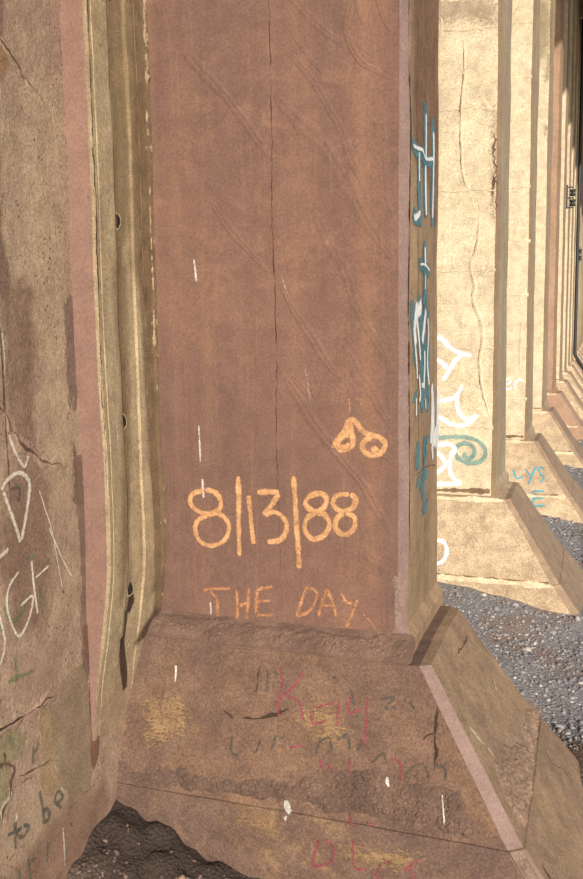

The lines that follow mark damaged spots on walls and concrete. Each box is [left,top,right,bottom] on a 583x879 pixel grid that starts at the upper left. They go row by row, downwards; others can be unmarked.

crack [0,36,48,111]
crack [0,329,68,501]
crack [0,689,58,739]
crack [224,708,287,720]
peeling [0,731,25,825]